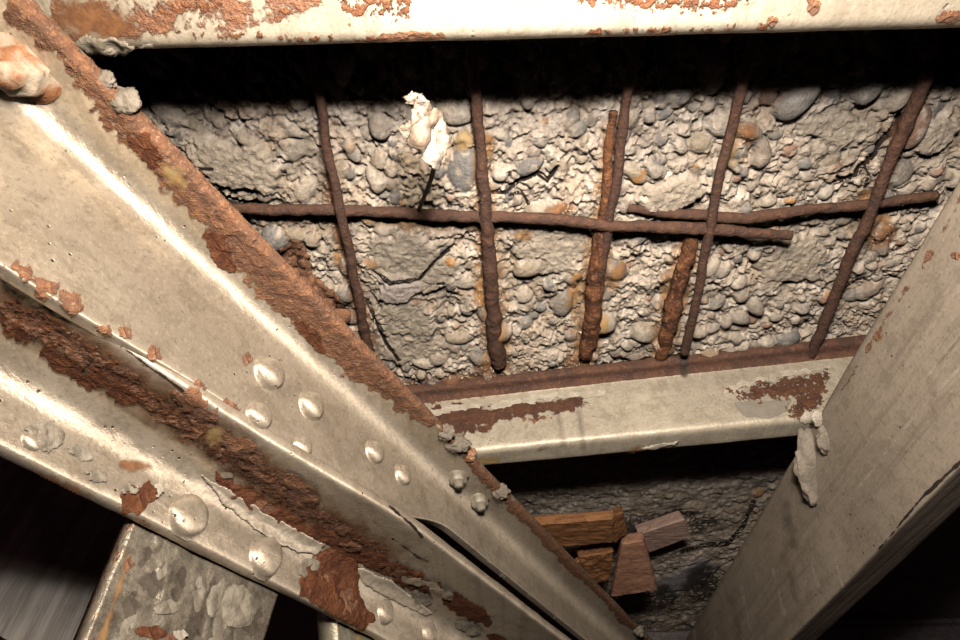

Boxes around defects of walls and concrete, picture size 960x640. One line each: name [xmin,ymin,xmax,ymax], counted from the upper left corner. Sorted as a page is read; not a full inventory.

corrosion [576,0,749,36]
corrosion [730,124,757,158]
spalling [75,27,960,386]
corrosion [858,177,897,248]
corrosion [0,0,649,640]
corrosion [650,242,689,359]
corrosion [865,286,909,353]
corrosion [723,364,831,424]
peeling [201,472,326,555]
crack [878,461,960,549]